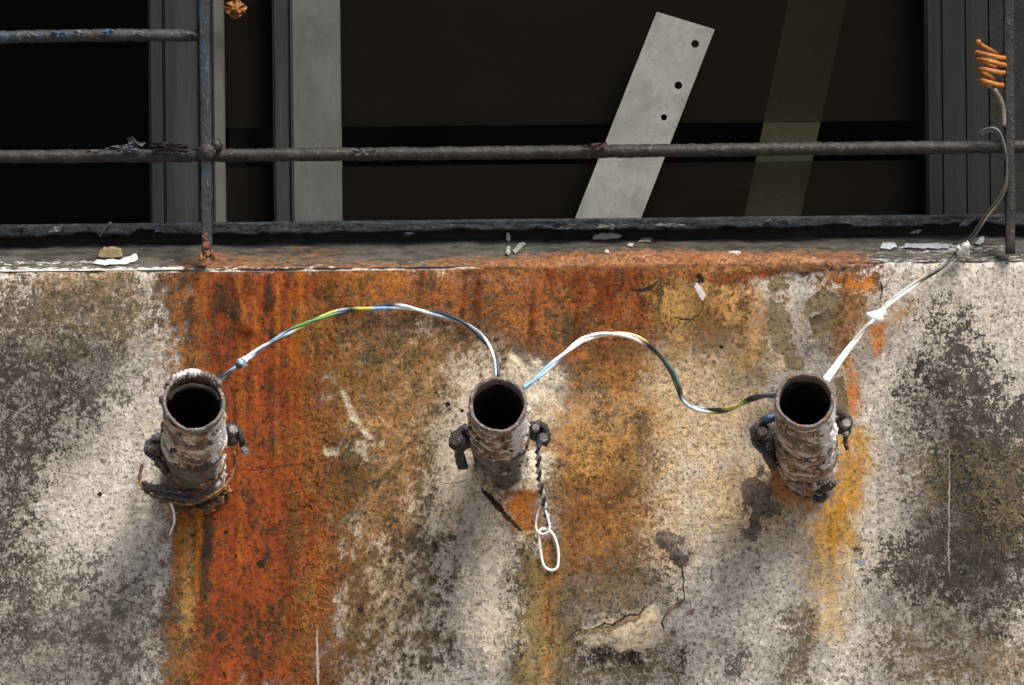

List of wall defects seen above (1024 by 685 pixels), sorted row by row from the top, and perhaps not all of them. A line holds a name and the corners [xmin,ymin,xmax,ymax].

rust [154,266,793,685]
crack [571,566,686,635]
rust [771,265,924,563]
leakage [848,290,1024,685]